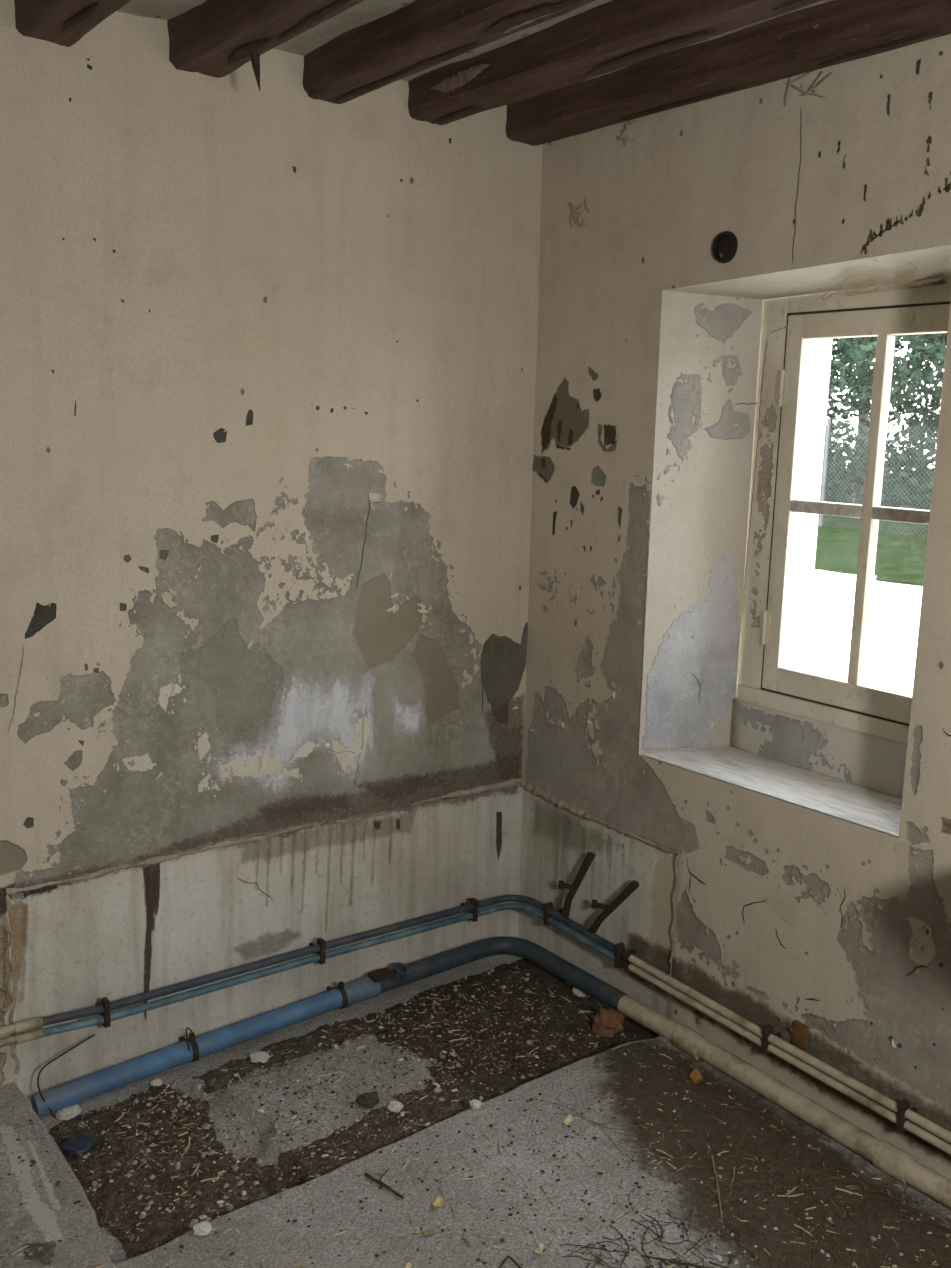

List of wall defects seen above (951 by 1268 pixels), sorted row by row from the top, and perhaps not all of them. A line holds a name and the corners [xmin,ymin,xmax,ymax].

water stain [820,172,951,300]
water stain [0,676,524,1018]
peeling [0,297,951,1116]
water stain [626,935,951,1161]